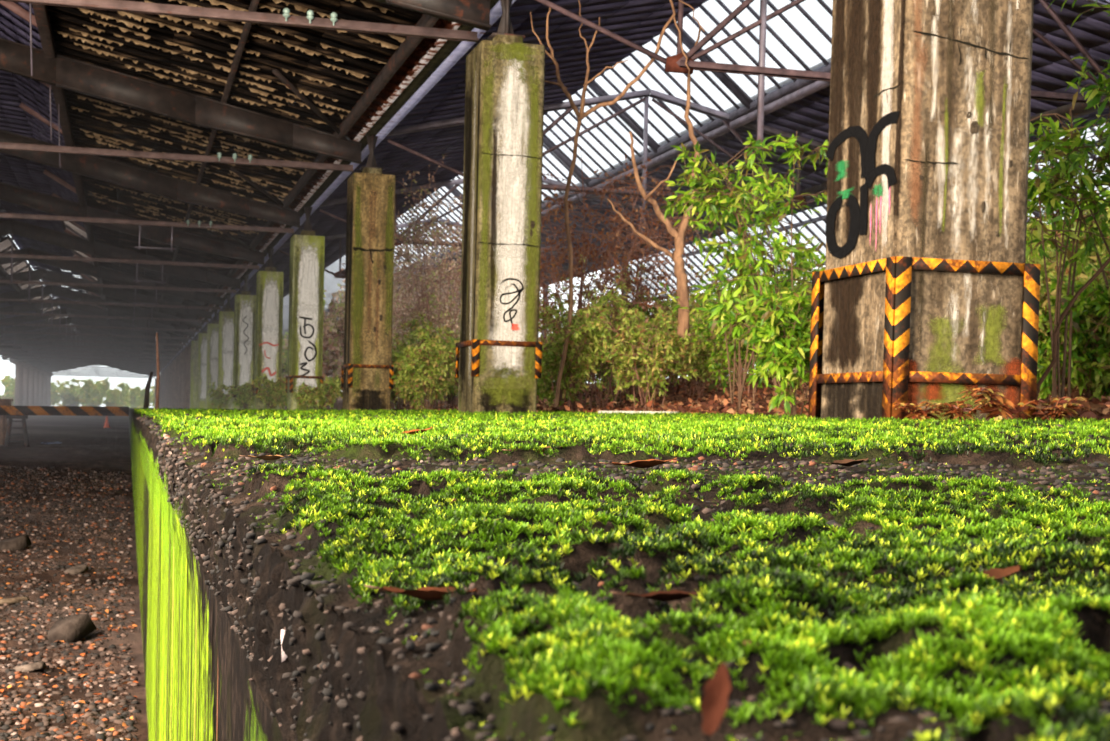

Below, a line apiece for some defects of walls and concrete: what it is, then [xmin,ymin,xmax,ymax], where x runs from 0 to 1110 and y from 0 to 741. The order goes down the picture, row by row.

water stain [343,192,384,411]
water stain [459,81,531,414]
water stain [827,275,864,369]
water stain [826,0,904,241]
corrosion [907,360,941,420]
water stain [920,0,958,340]
water stain [968,68,1010,231]
corrosion [964,359,1021,418]